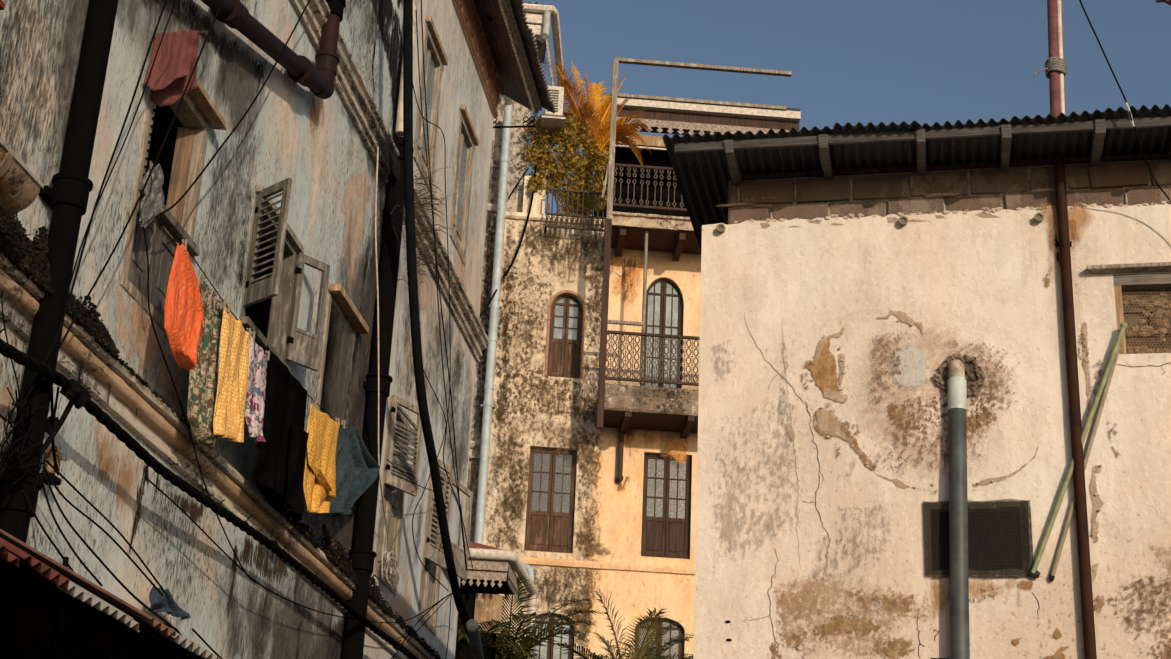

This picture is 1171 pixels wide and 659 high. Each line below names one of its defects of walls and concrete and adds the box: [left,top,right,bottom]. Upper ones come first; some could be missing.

leakage [325,0,403,438]
leakage [306,501,356,556]
leakage [396,163,644,655]
leakage [664,437,687,462]
crack [744,318,831,659]
flaking render [801,325,937,494]
leakage [869,332,949,474]
leakage [950,341,1019,457]